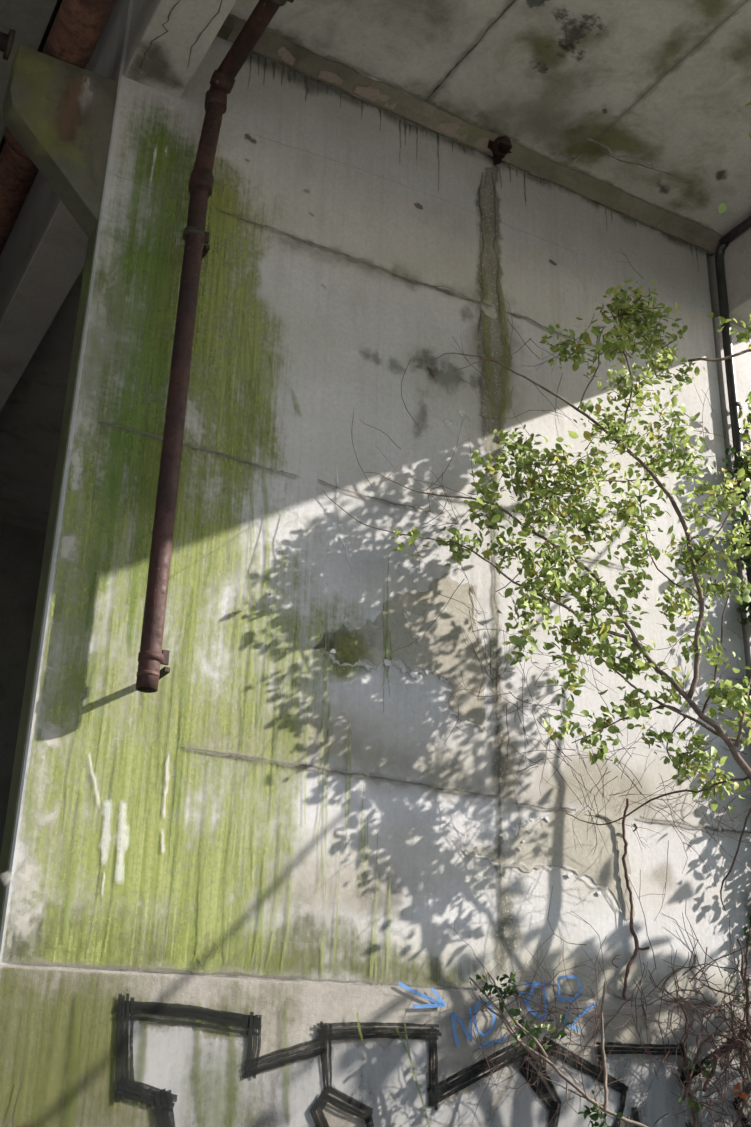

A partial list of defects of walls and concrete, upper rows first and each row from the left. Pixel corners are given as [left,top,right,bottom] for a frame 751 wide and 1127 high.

crack [140,0,180,69]
crack [187,0,223,69]
damp [526,0,602,60]
damp [248,51,364,117]
damp [380,110,473,159]
damp [476,154,549,975]
peeling [313,574,490,732]
damp [210,720,402,771]
peeling [457,809,635,920]
damp [7,905,178,968]
damp [193,917,464,987]